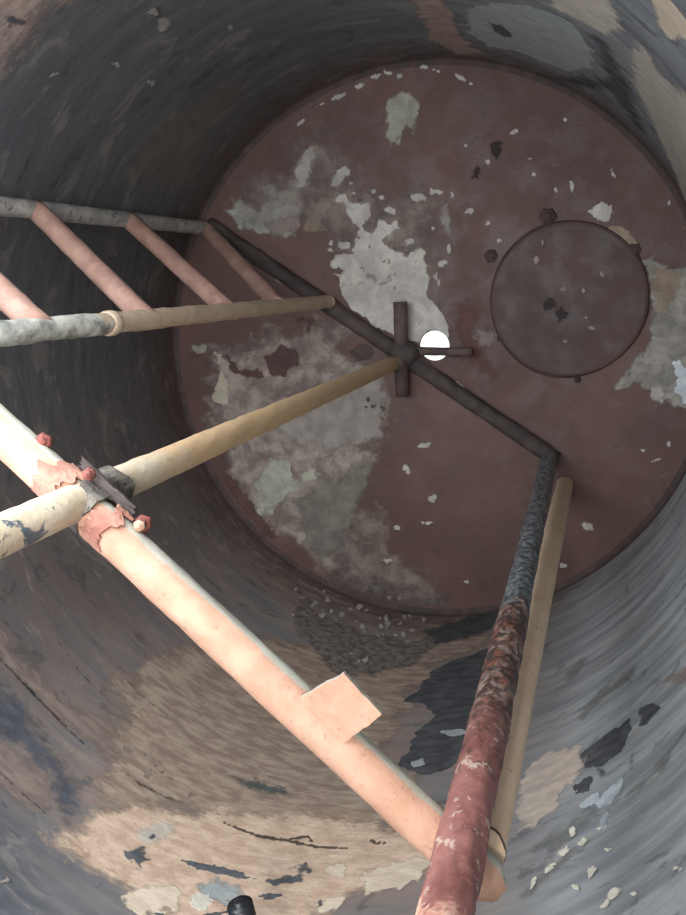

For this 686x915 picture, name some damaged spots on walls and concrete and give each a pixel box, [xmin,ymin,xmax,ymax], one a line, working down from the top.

peeling [355,71,403,89]
peeling [386,92,419,145]
peeling [227,134,454,343]
peeling [615,259,686,408]
peeling [259,587,488,780]
peeling [57,645,430,915]
crack [223,822,348,849]
peeling [530,826,587,889]
peeling [516,703,661,831]
peeling [599,887,637,908]